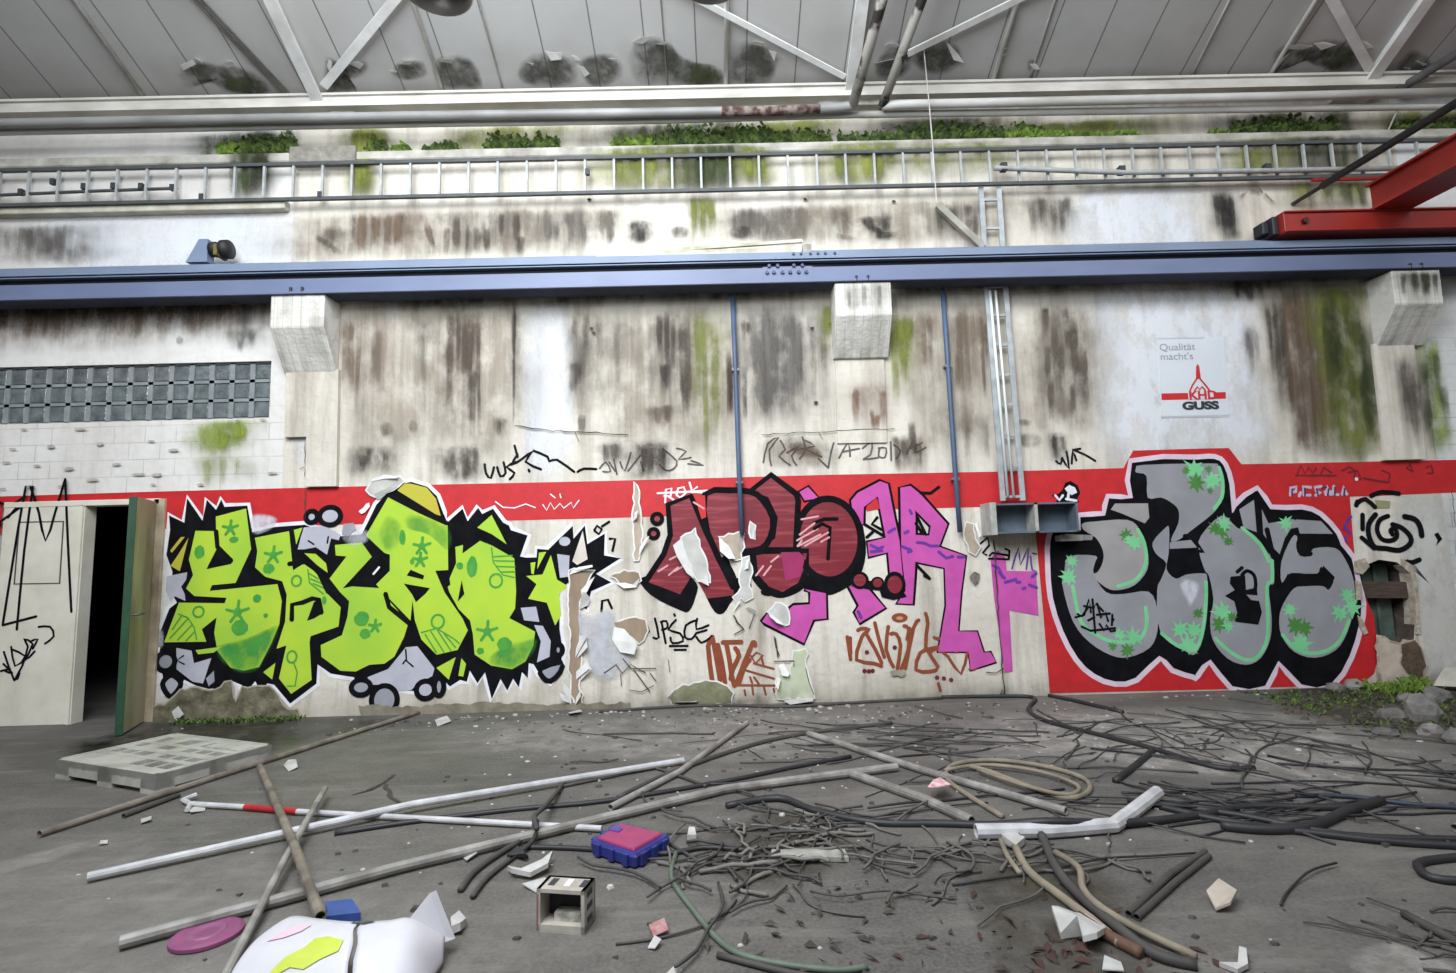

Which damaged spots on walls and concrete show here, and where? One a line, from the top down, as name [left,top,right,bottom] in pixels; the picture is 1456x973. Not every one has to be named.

leakage [355,210,613,250]
leakage [674,201,714,235]
leakage [732,207,908,238]
leakage [1213,188,1273,236]
leakage [447,313,515,417]
leakage [616,317,704,427]
leakage [710,314,803,413]
leakage [1042,309,1087,412]
peeling [673,521,791,627]
spalling [1354,558,1428,683]
peeling [668,679,734,705]
peeling [774,648,815,700]